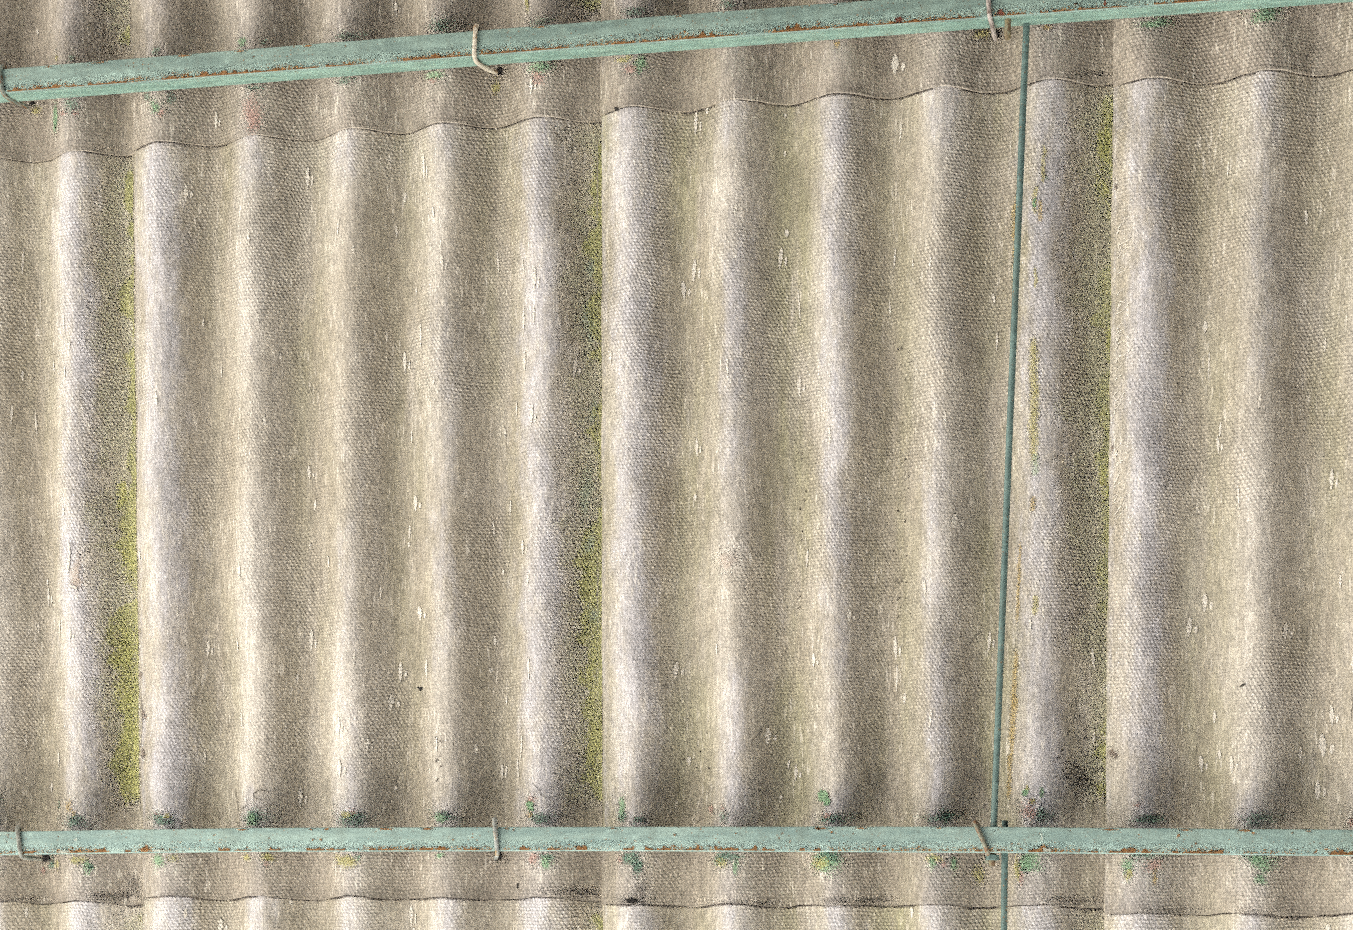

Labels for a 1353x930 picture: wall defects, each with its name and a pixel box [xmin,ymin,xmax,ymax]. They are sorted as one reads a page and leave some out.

rust [763,0,1209,33]
rust [7,15,746,92]
leakage [1319,705,1339,757]
leakage [1199,750,1238,773]
rust [0,827,1353,855]